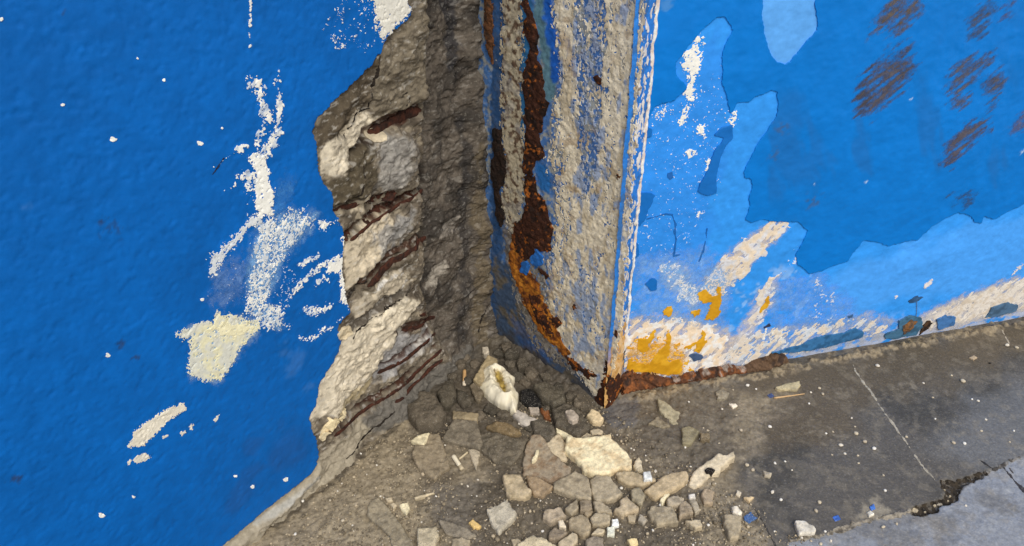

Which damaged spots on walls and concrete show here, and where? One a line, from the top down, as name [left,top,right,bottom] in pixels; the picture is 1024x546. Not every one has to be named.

corrosion [483,0,495,65]
corrosion [874,0,924,35]
corrosion [970,0,991,37]
corrosion [856,46,915,115]
corrosion [947,52,1006,111]
corrosion [940,120,993,166]
corrosion [490,0,789,408]
peeling [499,0,1024,396]
spalling [175,0,498,546]
peeling [127,402,194,465]
crack [752,365,942,546]
crack [962,456,1024,493]